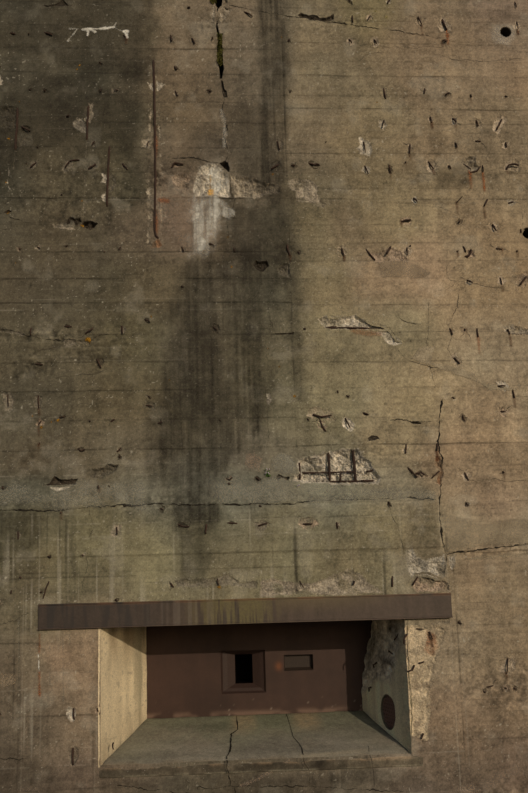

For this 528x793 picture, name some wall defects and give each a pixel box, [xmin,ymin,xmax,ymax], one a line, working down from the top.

crack [212,0,520,80]
spalling [139,60,330,245]
leakage [190,205,206,250]
leakage [208,168,233,227]
spalling [316,313,404,347]
crack [398,268,506,381]
crack [1,400,528,586]
spalling [274,434,383,487]
spalling [166,566,386,598]
spalling [405,618,464,742]
crack [117,714,403,793]